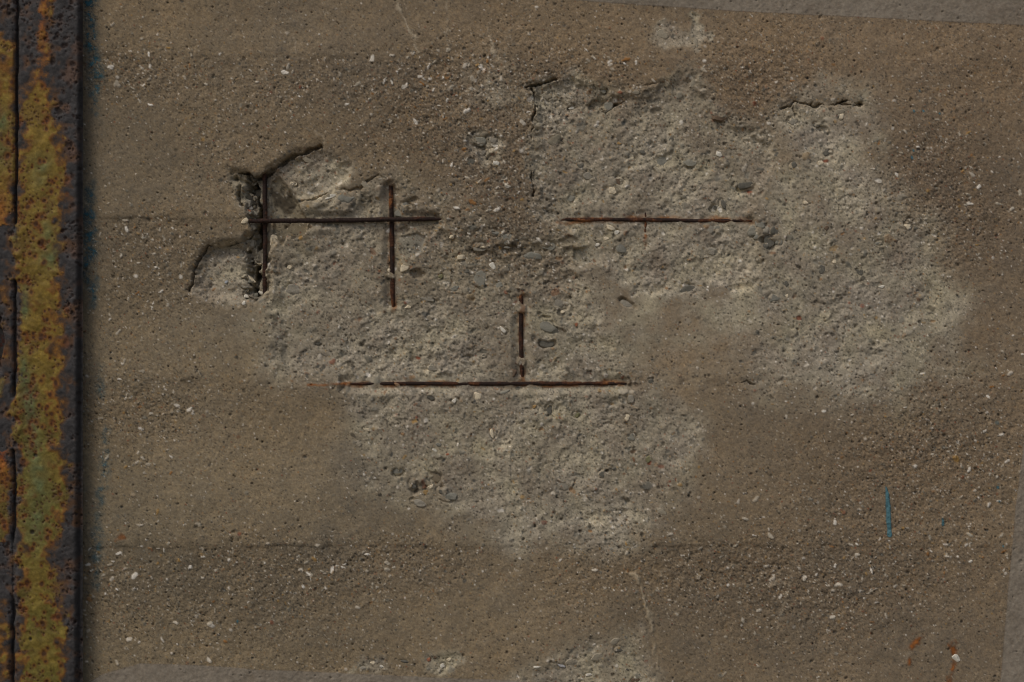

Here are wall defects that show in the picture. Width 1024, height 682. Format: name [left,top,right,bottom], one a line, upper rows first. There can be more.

crack [524,77,560,199]
spalling [188,67,966,559]